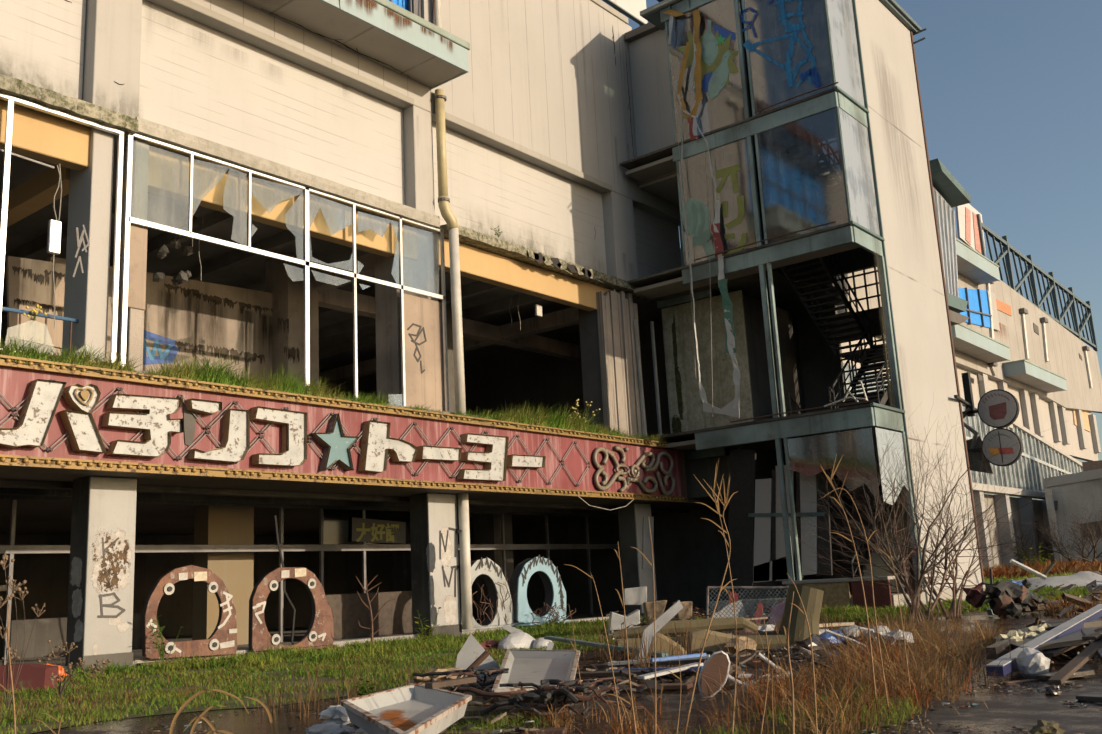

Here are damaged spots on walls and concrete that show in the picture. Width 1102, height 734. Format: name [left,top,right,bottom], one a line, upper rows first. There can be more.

corrosion [348,0,452,49]
water stain [187,292,221,335]
peeling [70,528,132,655]